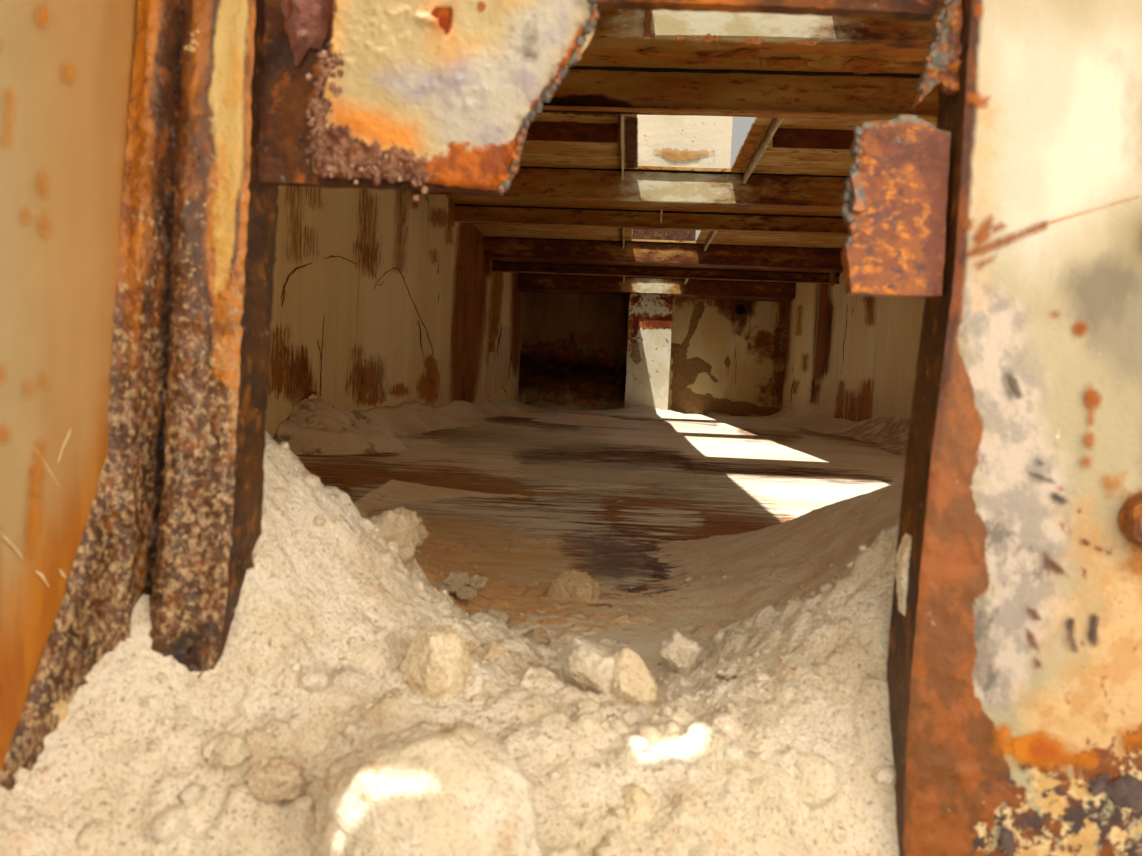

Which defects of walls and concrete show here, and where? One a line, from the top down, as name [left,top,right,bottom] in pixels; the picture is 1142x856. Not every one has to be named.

corrosion [290,50,437,276]
corrosion [537,94,638,169]
corrosion [731,124,766,172]
corrosion [346,208,522,406]
peeling [670,302,780,416]
corrosion [632,284,832,404]
corrosion [296,394,902,591]
spalling [1031,460,1067,503]
spalling [1043,553,1065,574]
spalling [1027,608,1041,668]
spalling [1067,614,1100,651]
peeling [999,827,1016,856]